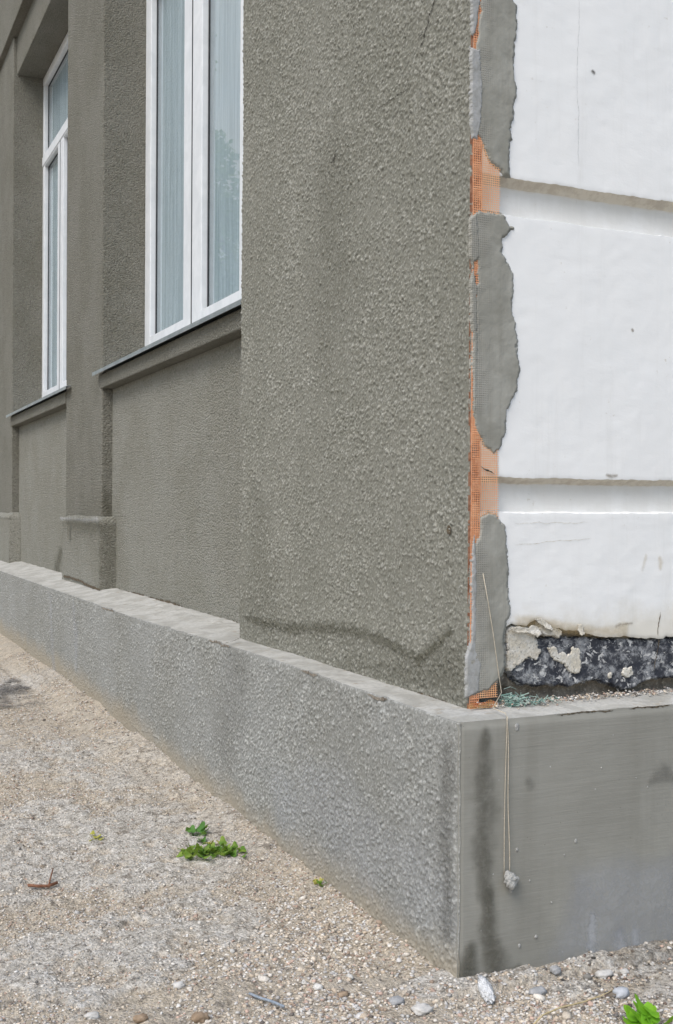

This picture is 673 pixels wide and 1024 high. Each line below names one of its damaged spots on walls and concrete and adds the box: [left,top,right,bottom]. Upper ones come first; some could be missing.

flaking render [504,619,585,674]
flaking render [608,666,633,678]
leakage [459,894,500,977]